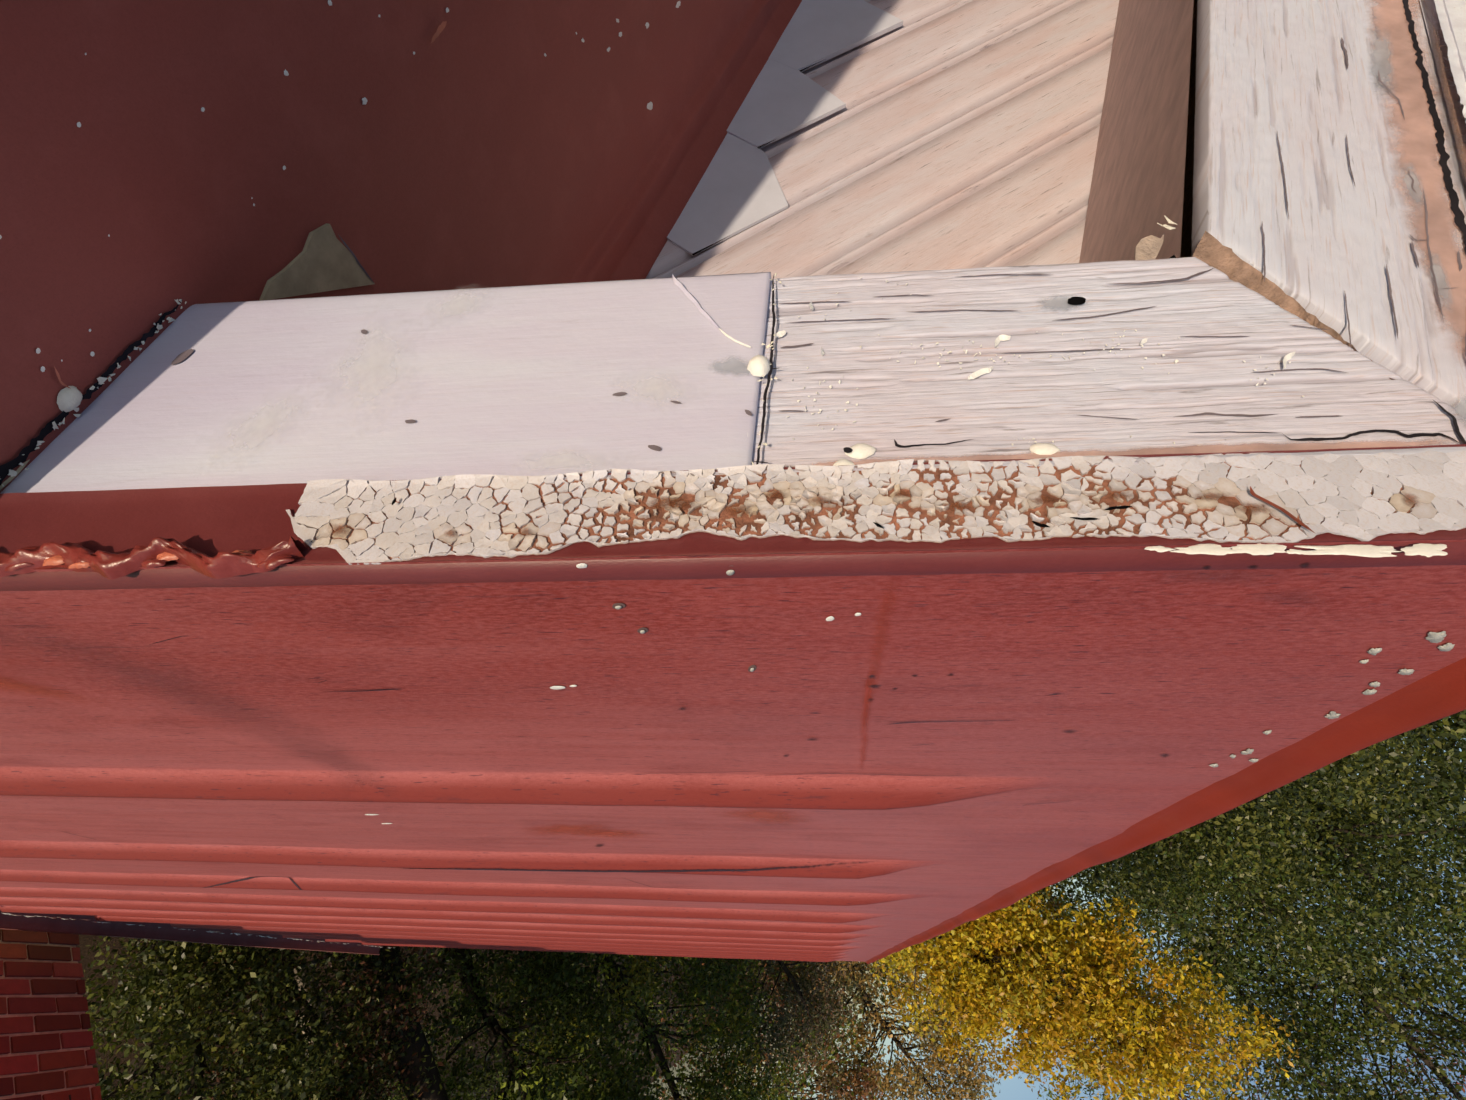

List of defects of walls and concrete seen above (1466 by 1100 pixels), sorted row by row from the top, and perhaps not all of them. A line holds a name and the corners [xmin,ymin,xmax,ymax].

crack [1261,133,1289,282]
crack [1341,0,1466,356]
peeling [889,335,1031,380]
crack [1180,332,1249,340]
crack [1251,291,1351,373]
peeling [286,348,1466,565]
crack [1175,400,1466,444]
corrosion [652,499,690,508]